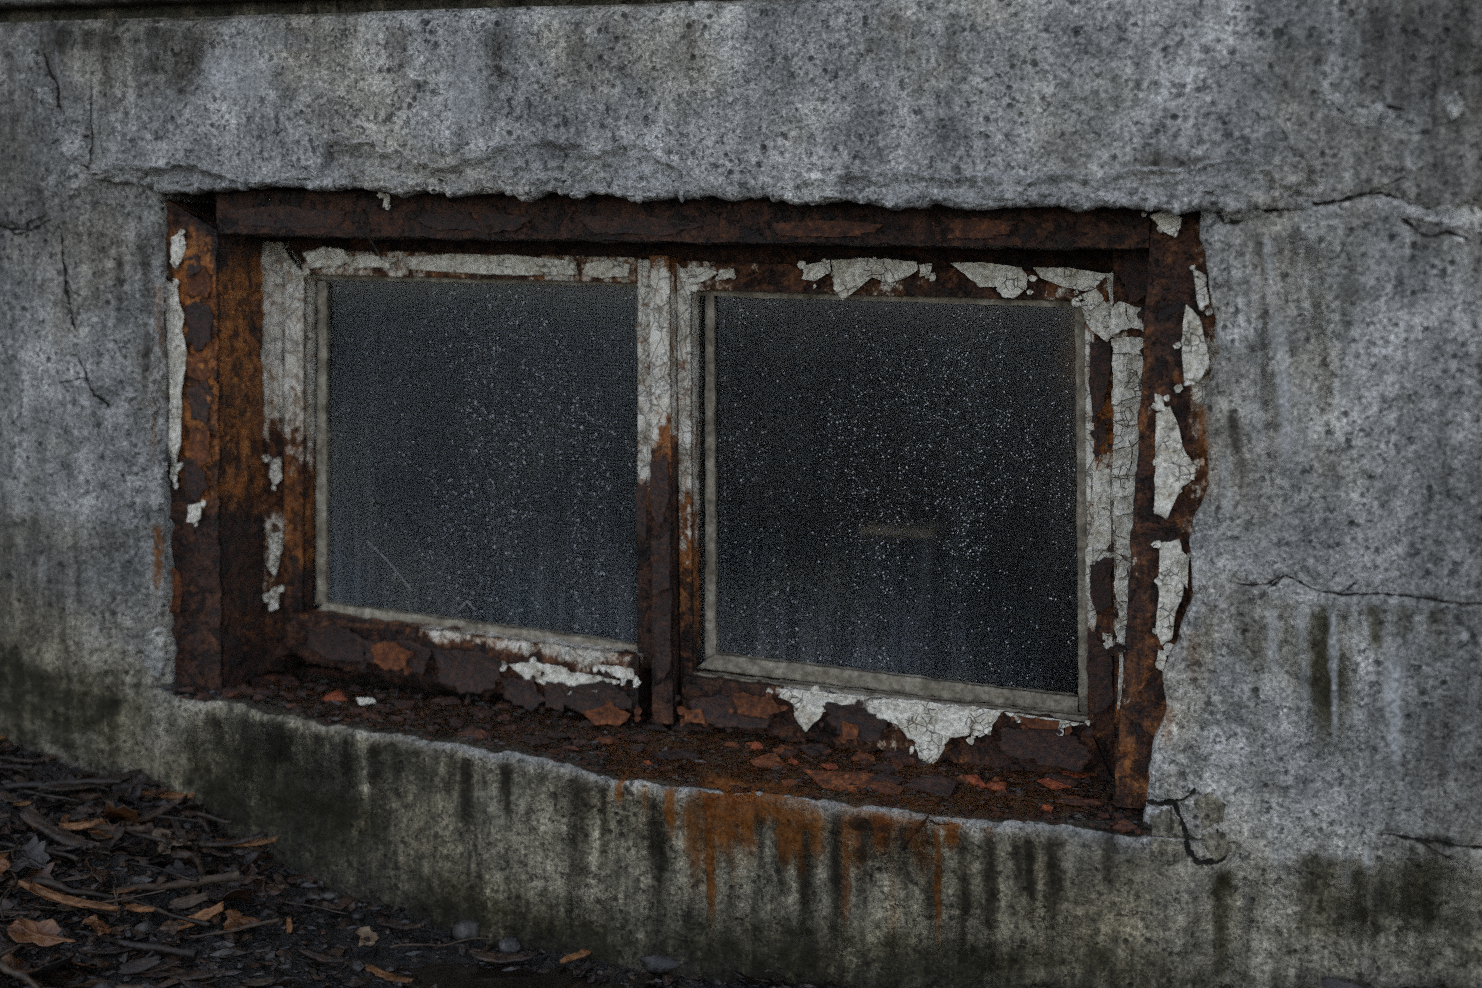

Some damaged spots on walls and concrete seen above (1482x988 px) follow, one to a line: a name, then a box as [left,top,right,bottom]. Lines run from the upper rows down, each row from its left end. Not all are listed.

spalling [37,87,708,210]
peeling [950,262,1213,710]
crack [1232,573,1482,605]
rust [294,622,642,744]
rust [819,699,888,745]
peeling [766,685,1090,766]
rust [998,543,1125,807]
leakage [578,784,607,853]
leakage [957,831,997,932]
leakage [1013,839,1059,907]
crack [1144,788,1231,865]
crack [1379,833,1482,860]